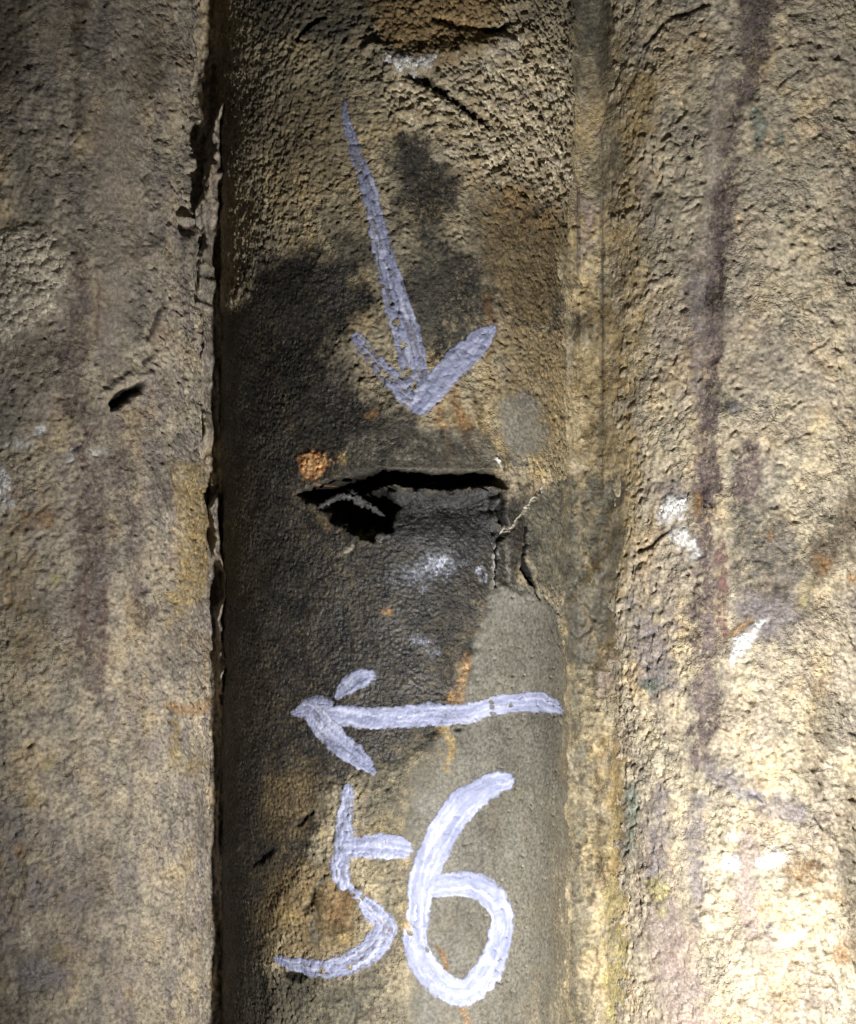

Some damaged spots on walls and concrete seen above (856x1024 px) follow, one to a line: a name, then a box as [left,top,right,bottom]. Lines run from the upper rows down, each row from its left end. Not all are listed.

crack [408,73,489,128]
crack [433,19,506,35]
corrosion [296,449,347,479]
crack [315,427,624,631]
damp [627,0,856,821]
peeling [360,474,622,1024]
damp [837,780,856,968]